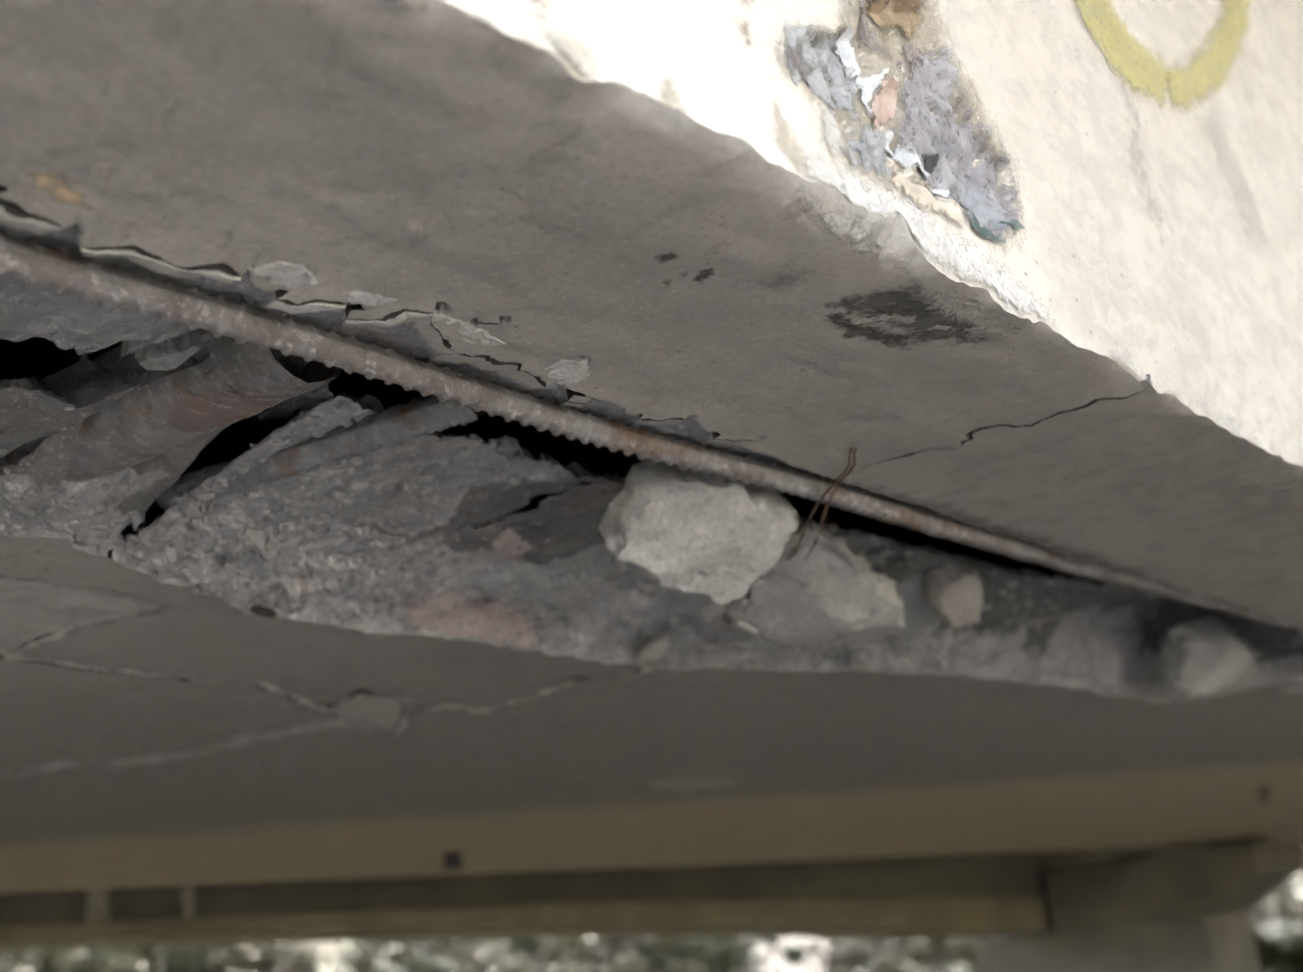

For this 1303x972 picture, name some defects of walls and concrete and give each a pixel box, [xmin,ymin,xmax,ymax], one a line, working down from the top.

peeling [834,23,889,115]
spalling [0,222,1303,703]
crack [849,374,1157,473]
crack [0,625,667,736]